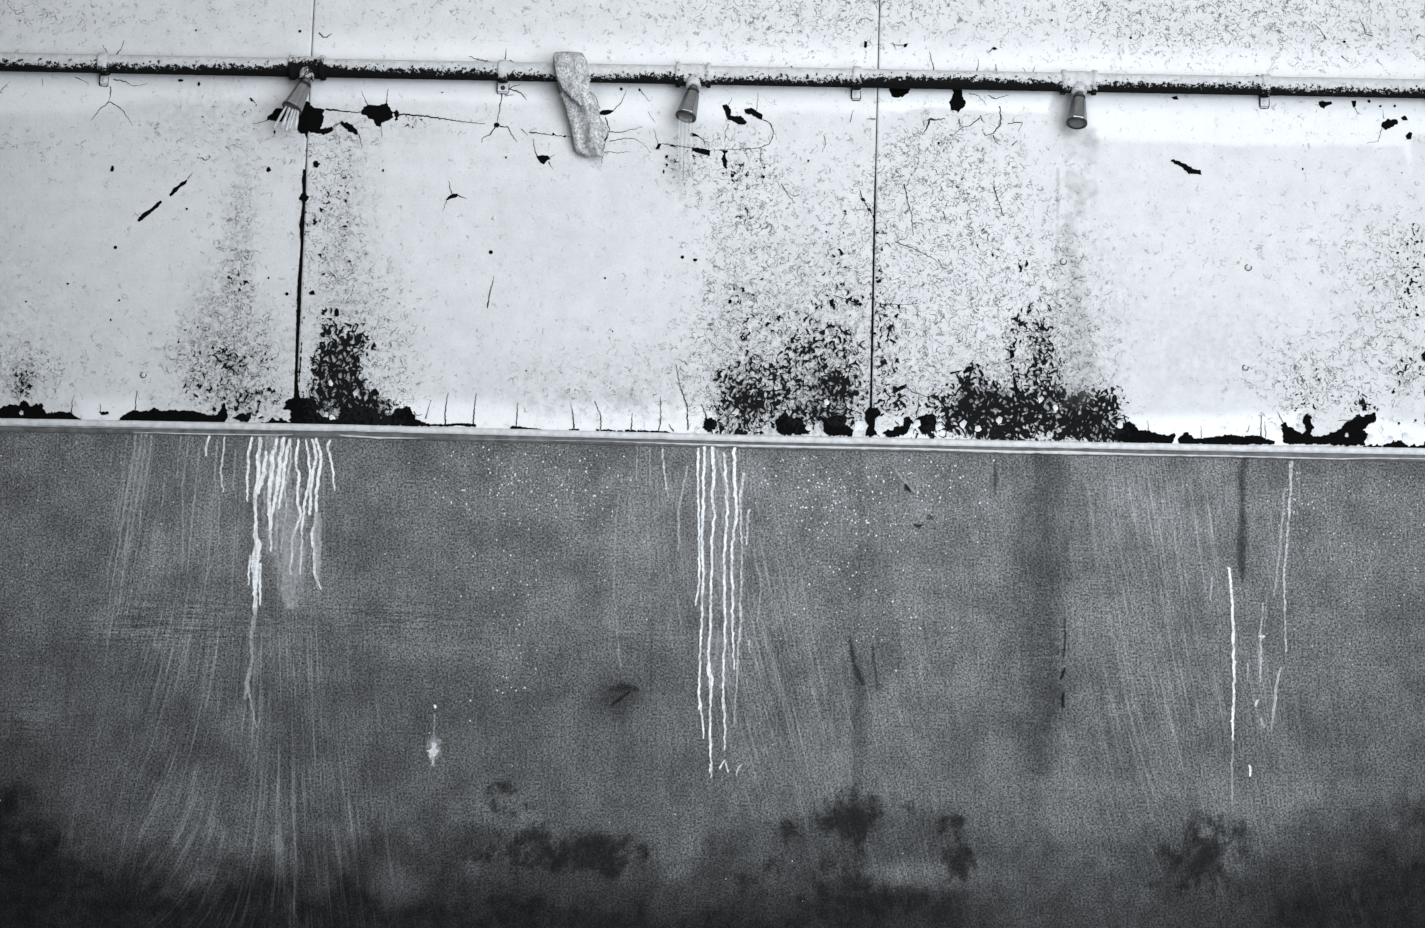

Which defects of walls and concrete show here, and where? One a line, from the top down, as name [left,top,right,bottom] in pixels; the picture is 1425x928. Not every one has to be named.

leakage [174,155,411,728]
leakage [712,162,766,221]
leakage [636,230,1134,778]